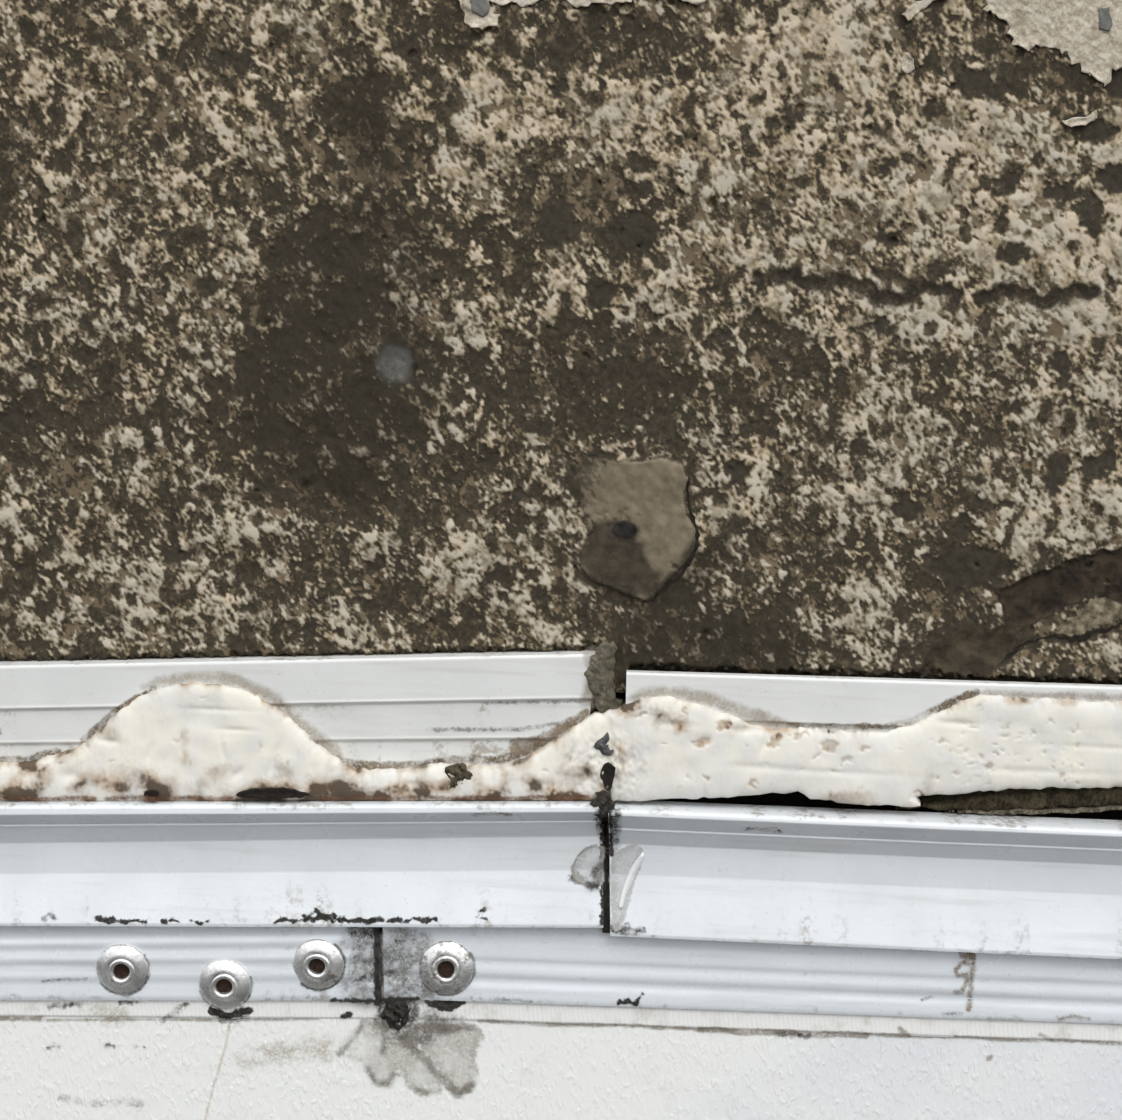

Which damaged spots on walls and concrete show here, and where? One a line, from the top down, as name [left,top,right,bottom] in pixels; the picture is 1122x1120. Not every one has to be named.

peeling [459,0,539,31]
peeling [555,0,632,8]
peeling [902,0,934,21]
peeling [983,0,1122,86]
peeling [900,53,915,74]
peeling [1062,110,1098,127]
spalling [577,458,700,603]
spalling [910,547,1122,680]
leakage [95,915,209,926]
leakage [273,907,483,1095]